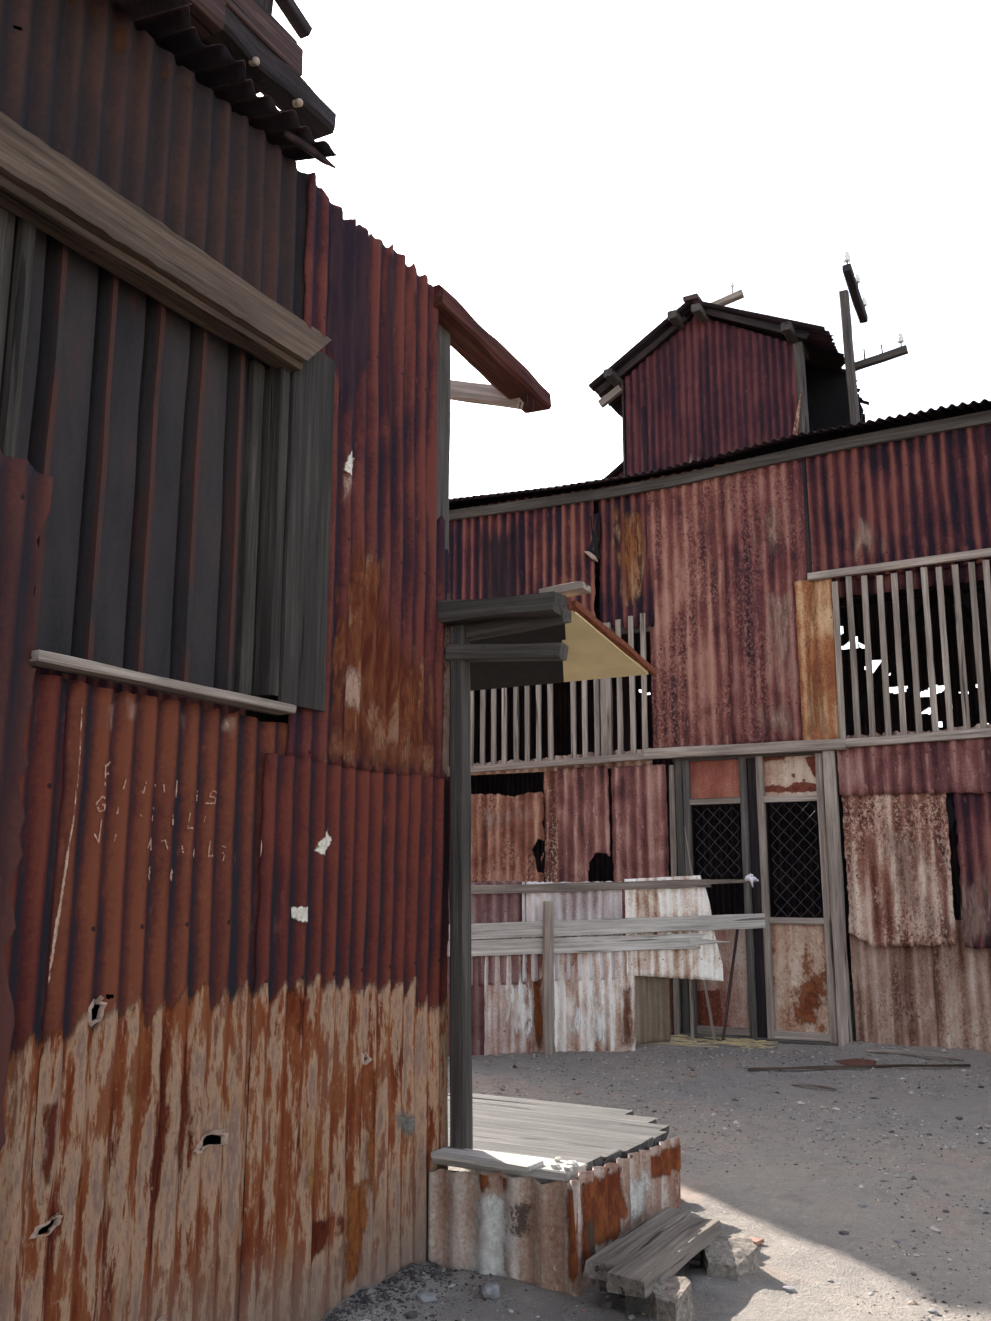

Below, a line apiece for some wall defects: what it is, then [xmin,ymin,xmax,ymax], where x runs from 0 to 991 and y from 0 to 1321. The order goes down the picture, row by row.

corrosion [612,511,645,604]
corrosion [325,542,450,774]
spalling [314,831,332,855]
spalling [291,906,308,923]
corrosion [533,978,543,1047]
corrosion [621,987,635,1045]
corrosion [793,943,827,1033]
corrosion [0,973,449,1321]
corrosion [479,1174,506,1192]
corrosion [651,1144,681,1178]
corrosion [511,1203,532,1243]
corrosion [566,1167,628,1281]